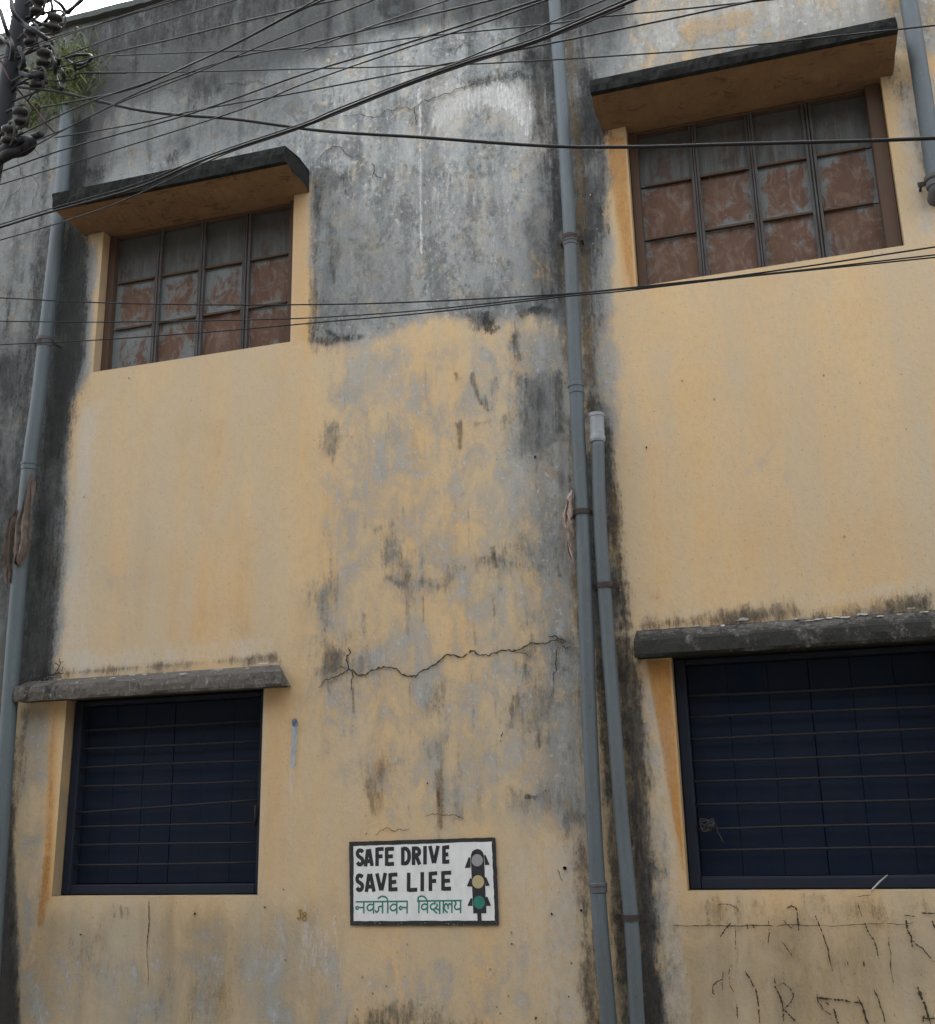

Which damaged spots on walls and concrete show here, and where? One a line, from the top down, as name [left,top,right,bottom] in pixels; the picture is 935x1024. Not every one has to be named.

damp [0,235,47,572]
damp [20,223,88,682]
damp [469,310,500,334]
damp [418,2,566,317]
crack [318,635,570,690]
damp [590,527,630,1024]
damp [604,427,679,1024]
damp [582,931,599,1024]